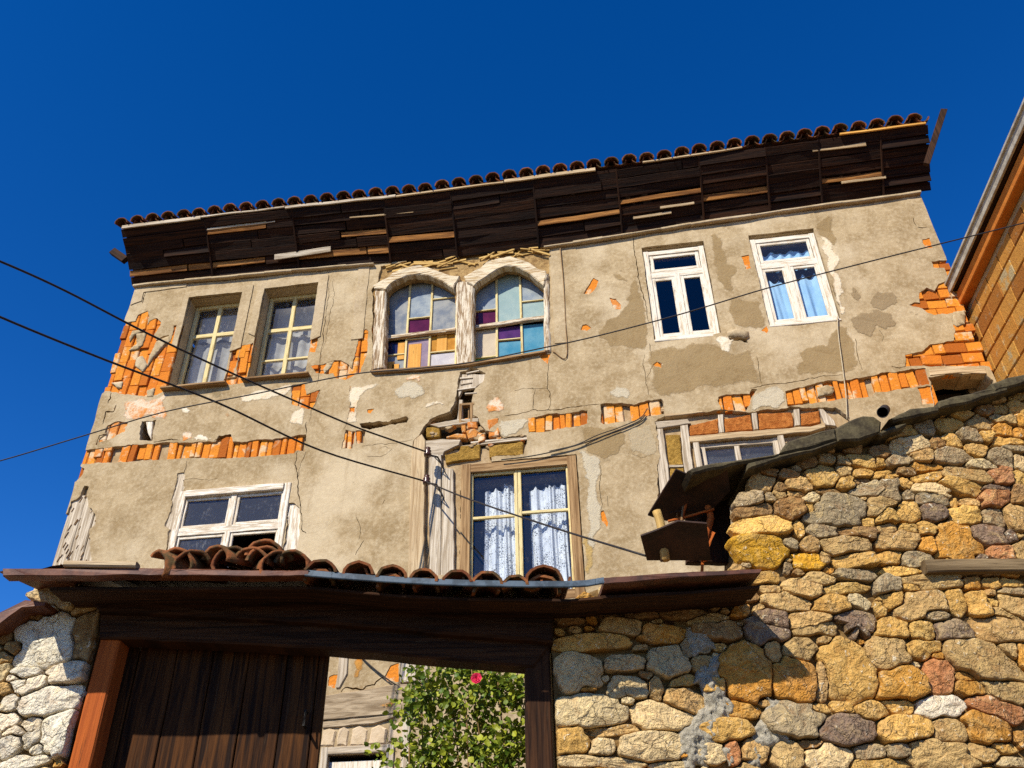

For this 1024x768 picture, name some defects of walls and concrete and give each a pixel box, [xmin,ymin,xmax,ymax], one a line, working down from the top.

flaking render [52,311,320,566]
flaking render [311,327,377,449]
peeling [395,216,992,573]